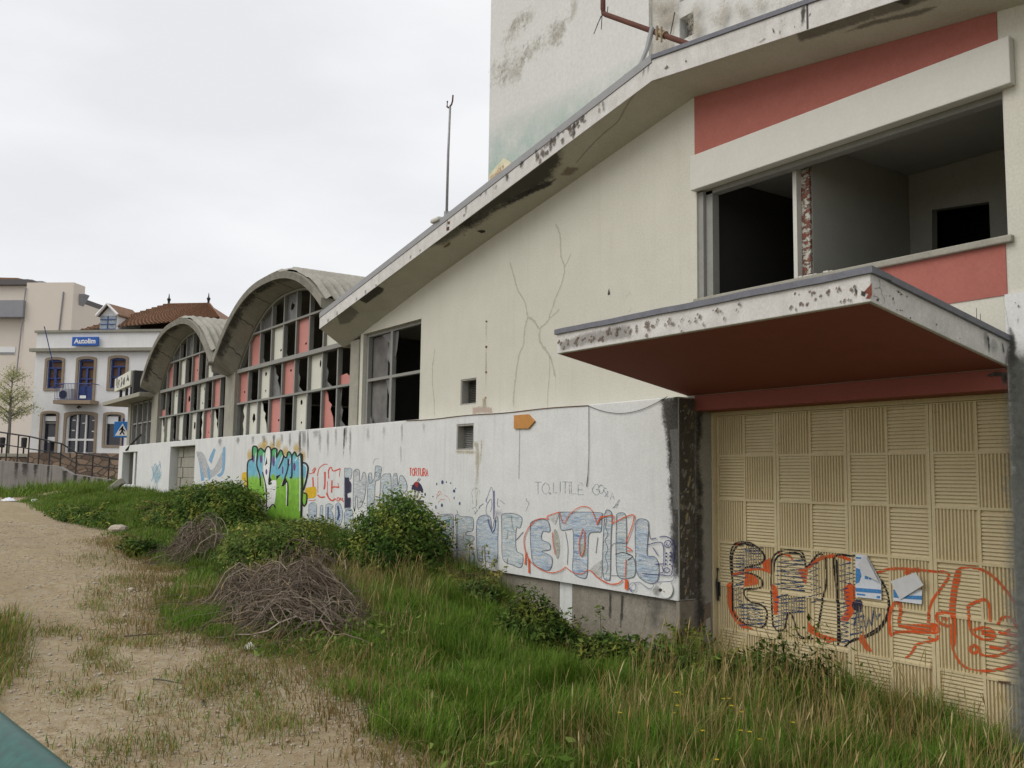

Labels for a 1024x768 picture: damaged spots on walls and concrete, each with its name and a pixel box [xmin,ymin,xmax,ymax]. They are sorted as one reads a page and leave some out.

leakage [435,102,604,244]
spalling [801,168,813,276]
peeling [557,313,704,350]
peeling [789,283,879,311]
leakage [661,397,704,640]
leakage [987,328,1024,763]